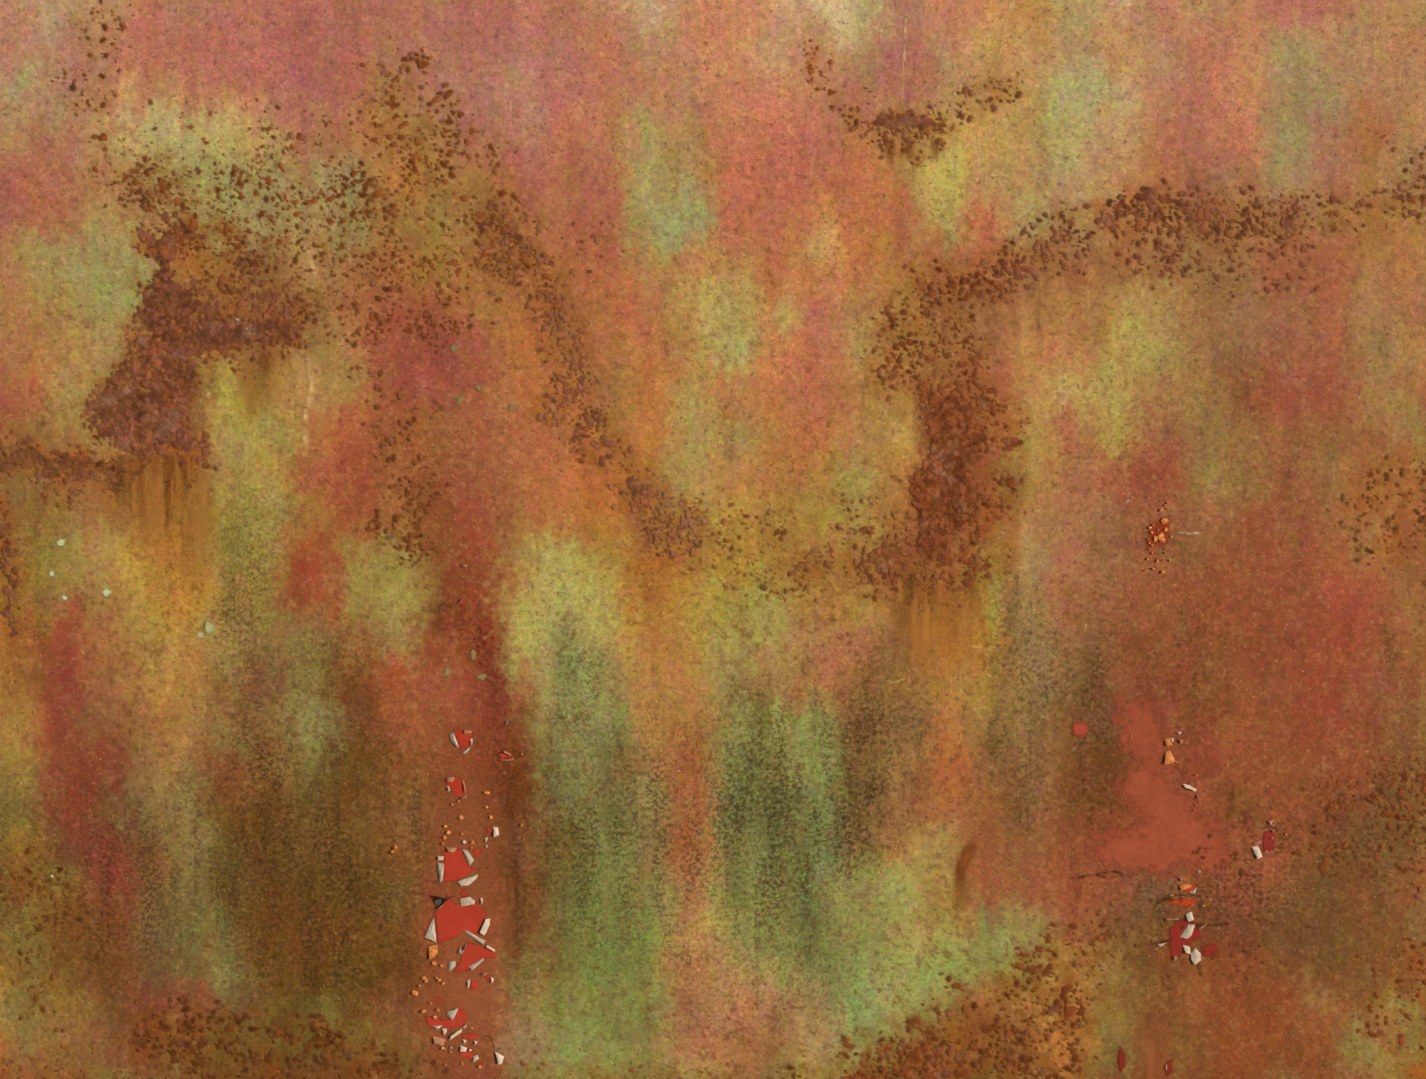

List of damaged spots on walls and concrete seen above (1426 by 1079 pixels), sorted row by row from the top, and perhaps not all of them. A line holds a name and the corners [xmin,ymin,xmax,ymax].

corrosion [51,0,134,115]
corrosion [0,36,1426,637]
corrosion [0,845,116,1079]
corrosion [92,995,449,1079]
peeling [412,729,523,1072]
corrosion [831,834,1298,1079]
peeling [1085,693,1233,965]
peeling [1252,820,1287,859]
corrosion [1257,755,1426,908]
corrosion [1350,938,1426,1079]